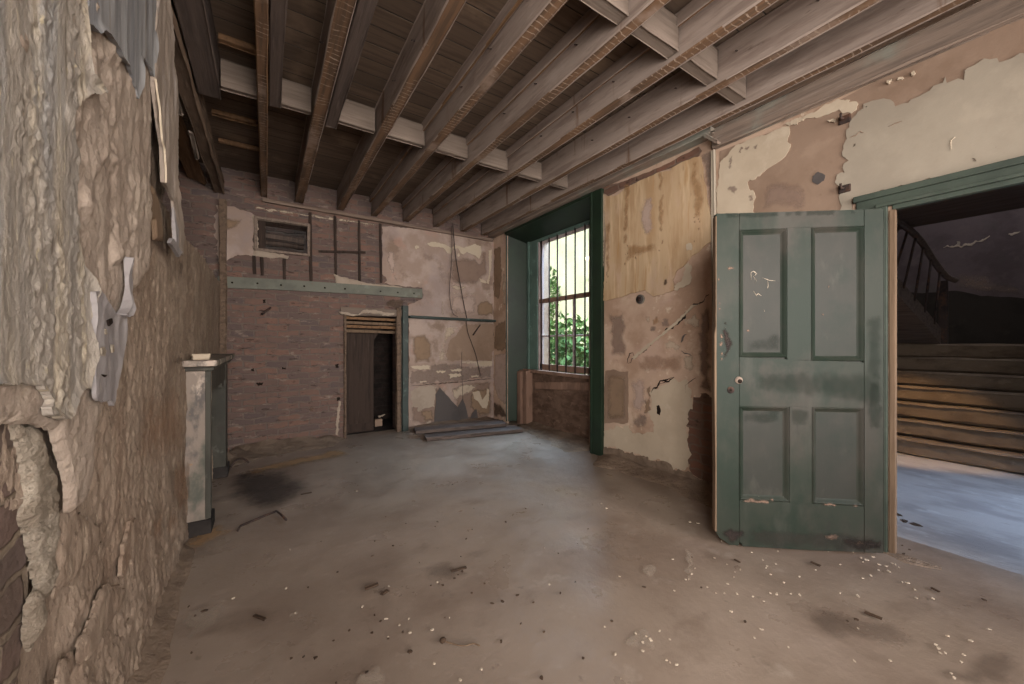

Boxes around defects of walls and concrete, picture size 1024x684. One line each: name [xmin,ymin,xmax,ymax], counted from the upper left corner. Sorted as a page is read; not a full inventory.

peeling [716,53,1024,214]
flaking render [415,242,492,284]
peeling [0,0,185,684]
spalling [411,323,494,423]
crack [627,294,709,393]
water stain [237,451,345,504]
flaking render [603,393,713,486]